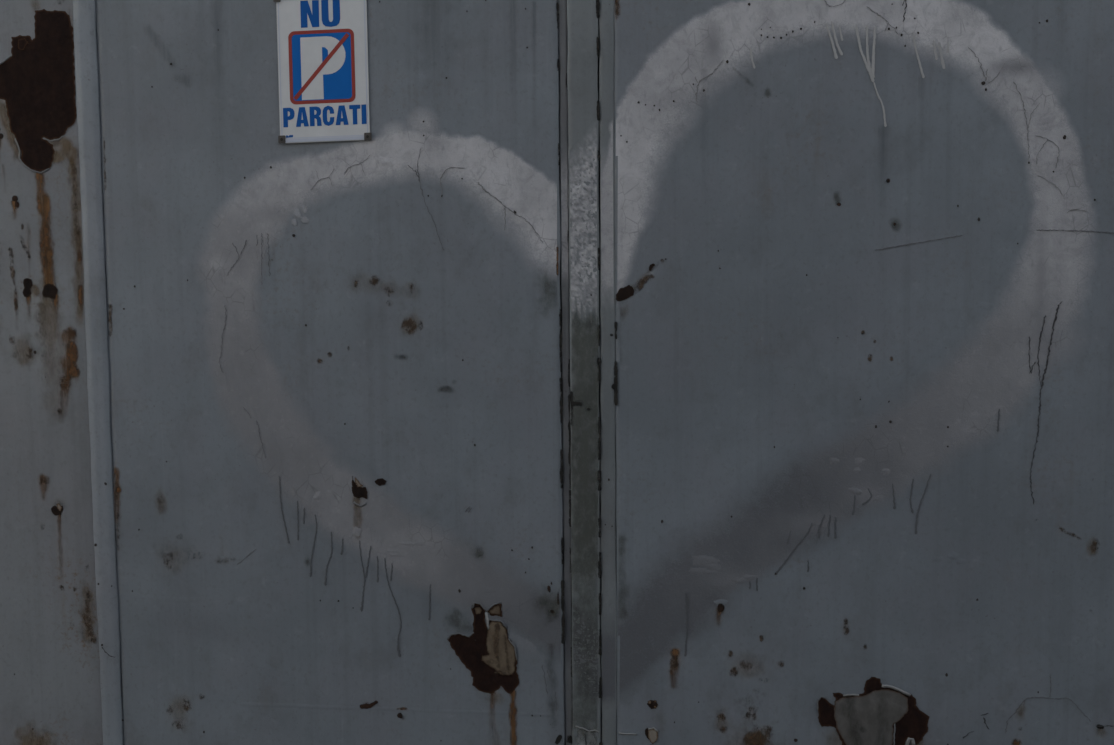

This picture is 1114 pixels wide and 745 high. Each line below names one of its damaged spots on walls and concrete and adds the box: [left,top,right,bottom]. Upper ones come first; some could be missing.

peeling [0,9,76,212]
rust [9,196,58,311]
rust [70,149,83,306]
rust [60,328,80,396]
peeling [481,605,516,676]
rust [509,690,517,745]
rust [743,708,772,745]
peeling [834,689,909,745]